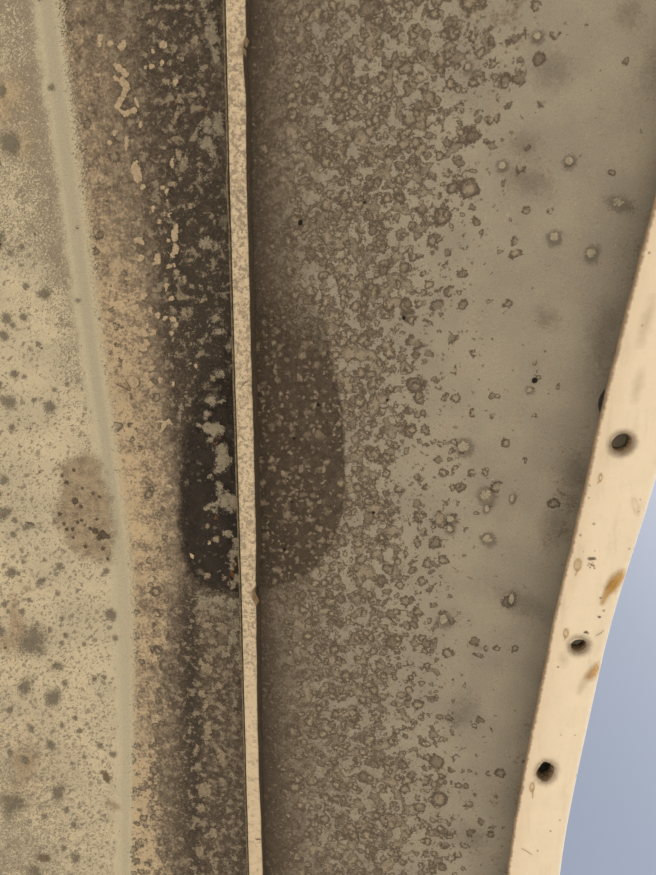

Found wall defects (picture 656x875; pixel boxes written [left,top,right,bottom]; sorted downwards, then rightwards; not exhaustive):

damp [57,456,114,574]
damp [178,344,239,595]
damp [256,303,345,588]
corrosion [602,572,625,604]